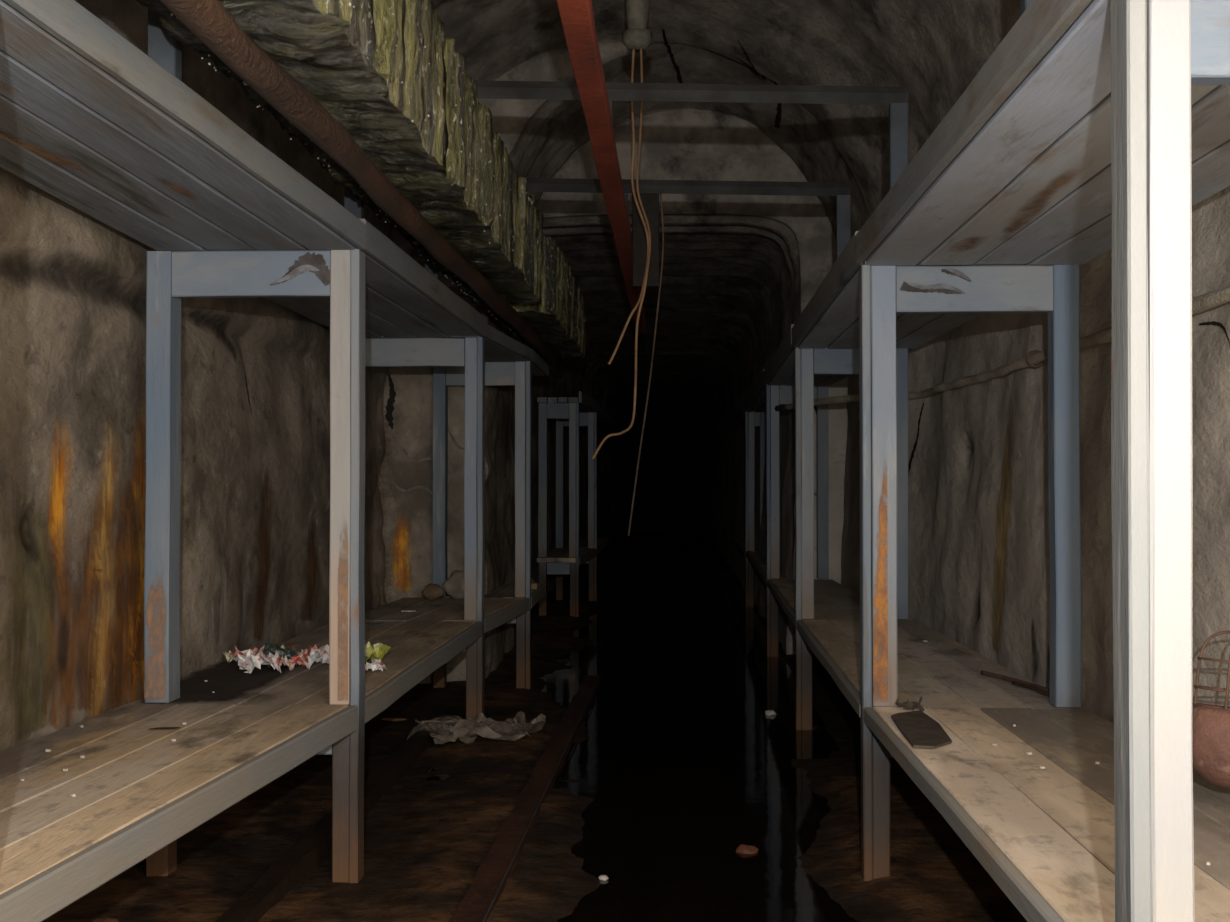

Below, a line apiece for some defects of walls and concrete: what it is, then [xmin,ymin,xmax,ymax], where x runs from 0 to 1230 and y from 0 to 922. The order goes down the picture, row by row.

rust [50,426,166,729]
rust [394,522,411,592]
rust [873,475,888,700]